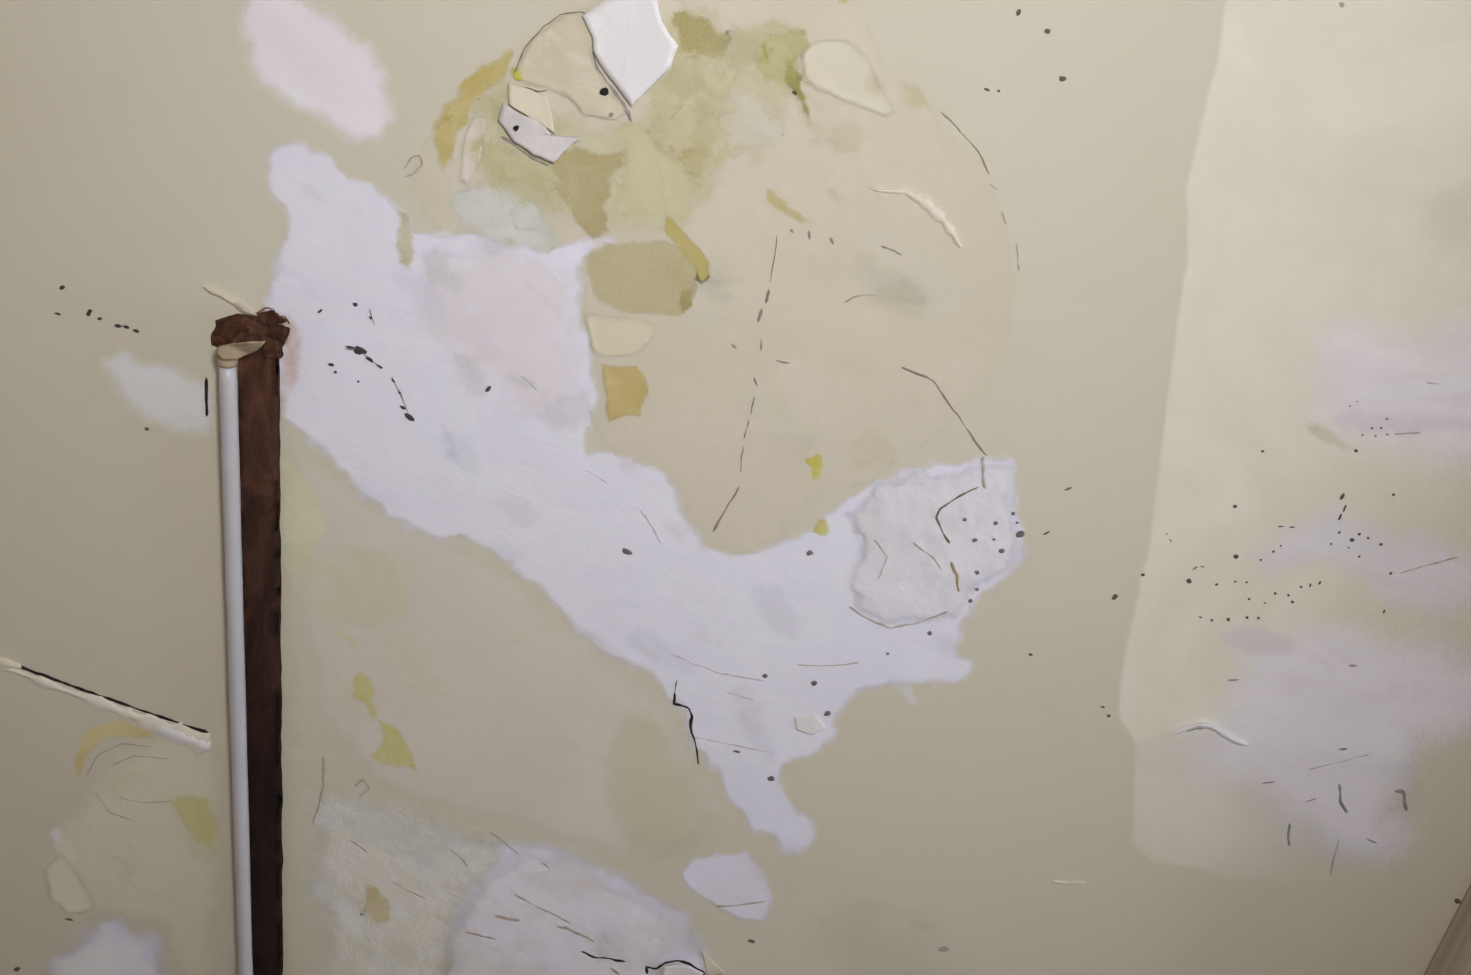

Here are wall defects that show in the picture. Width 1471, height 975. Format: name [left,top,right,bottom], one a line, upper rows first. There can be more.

peeling [498,0,678,166]
corrosion [204,307,303,975]
crack [0,657,211,822]